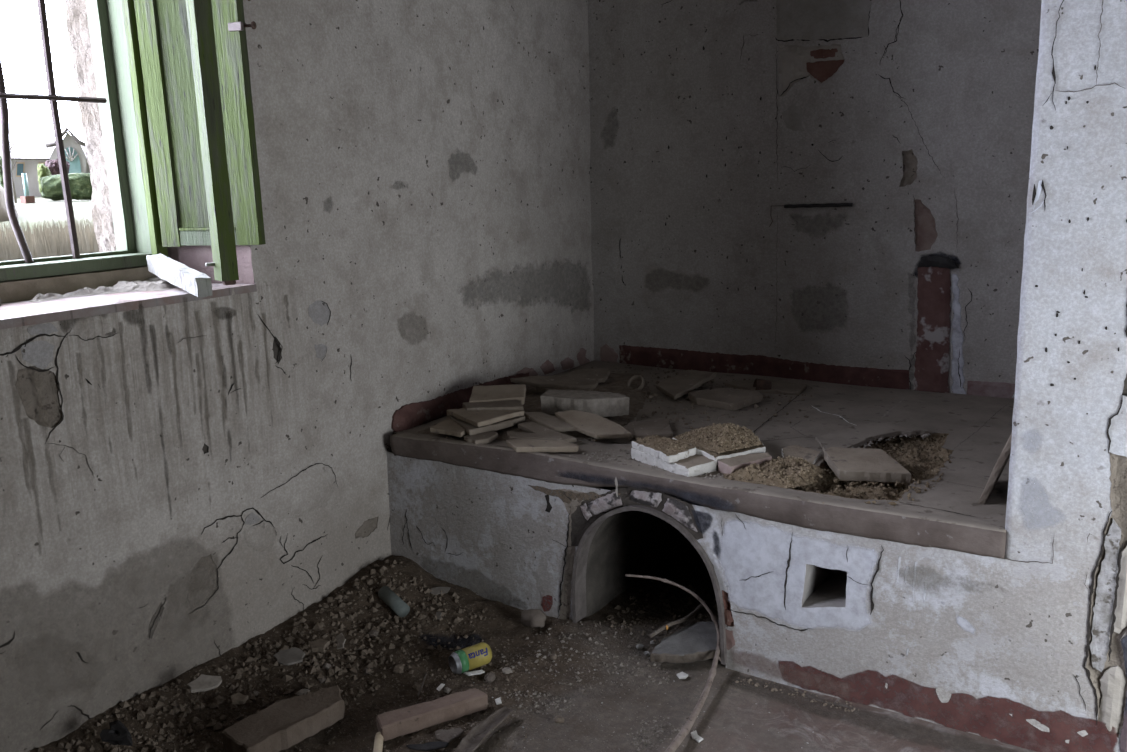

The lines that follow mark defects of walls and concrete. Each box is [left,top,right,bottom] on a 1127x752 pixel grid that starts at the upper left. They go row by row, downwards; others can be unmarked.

spalling [777,44,845,96]
crack [1044,0,1124,110]
crack [740,0,959,253]
spalling [899,149,938,252]
flaking render [952,274,966,394]
crack [0,328,117,473]
crack [137,463,338,639]
crack [732,532,809,631]
crack [846,545,884,615]
spalling [1065,375,1127,743]
spalling [936,687,951,703]
spalling [1026,719,1049,732]